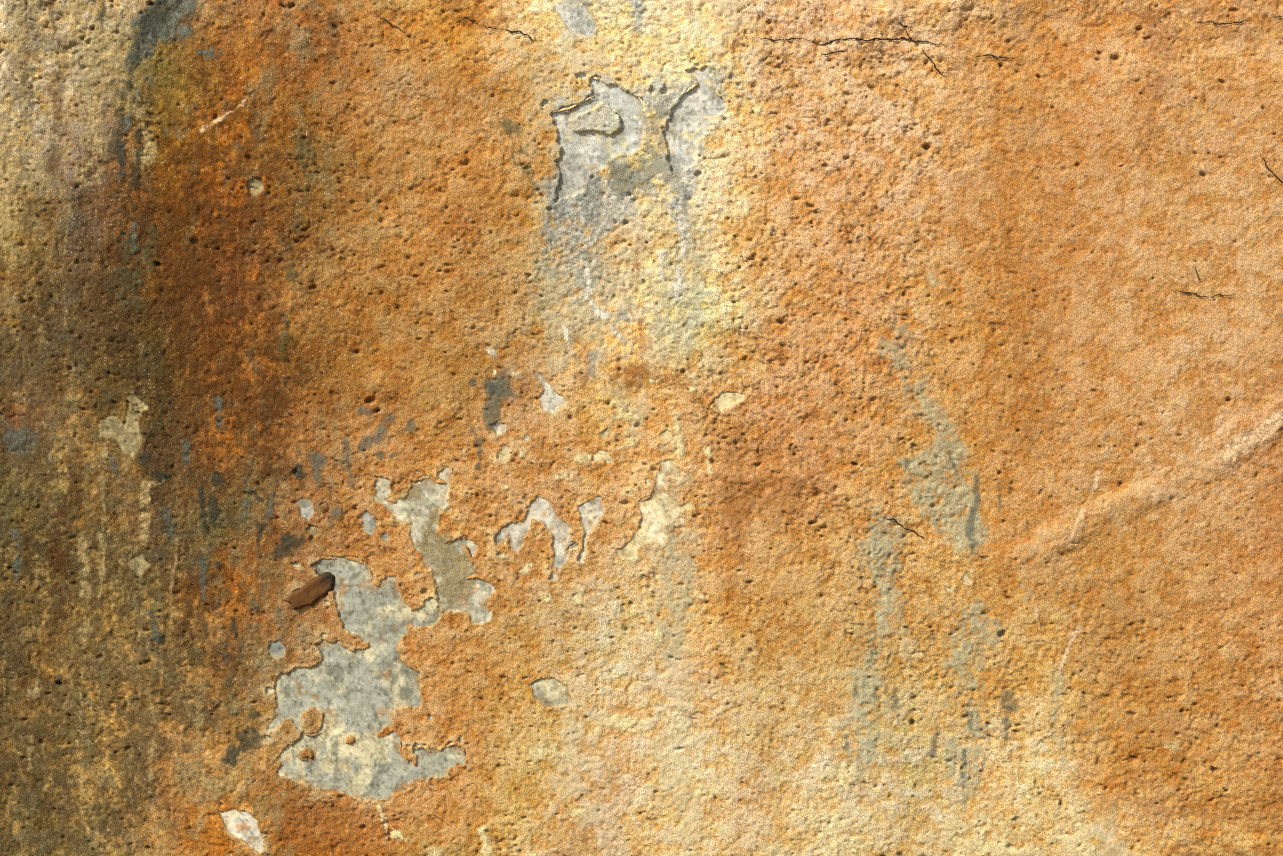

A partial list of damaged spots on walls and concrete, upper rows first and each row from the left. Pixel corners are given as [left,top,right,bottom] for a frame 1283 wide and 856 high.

crack [757,20,1015,77]
spalling [542,66,727,211]
spalling [264,463,604,800]
spalling [220,806,264,853]